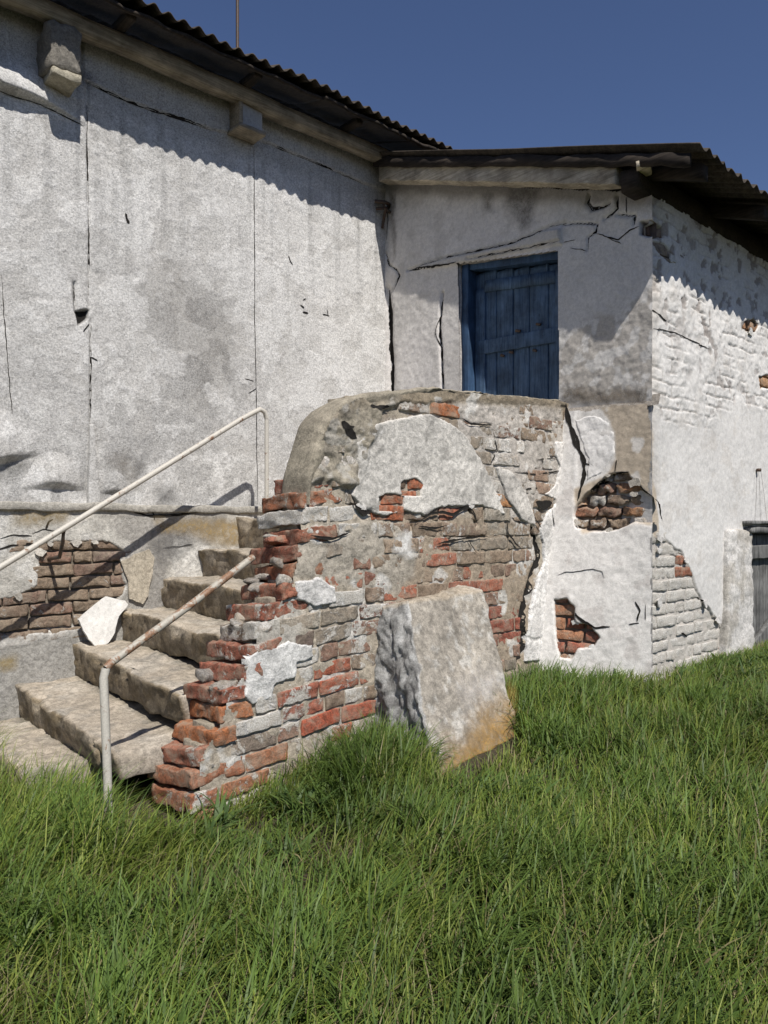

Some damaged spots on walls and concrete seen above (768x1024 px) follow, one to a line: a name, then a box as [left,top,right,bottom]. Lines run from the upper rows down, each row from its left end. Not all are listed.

crack [0,91,90,288]
crack [1,275,13,415]
spalling [72,285,87,324]
crack [83,324,98,424]
crack [247,174,258,499]
crack [386,196,639,391]
crack [652,310,707,348]
flaking render [0,539,155,642]
peeling [351,414,599,662]
crack [517,401,662,519]
flaking render [574,416,647,532]
flaking render [629,532,722,680]